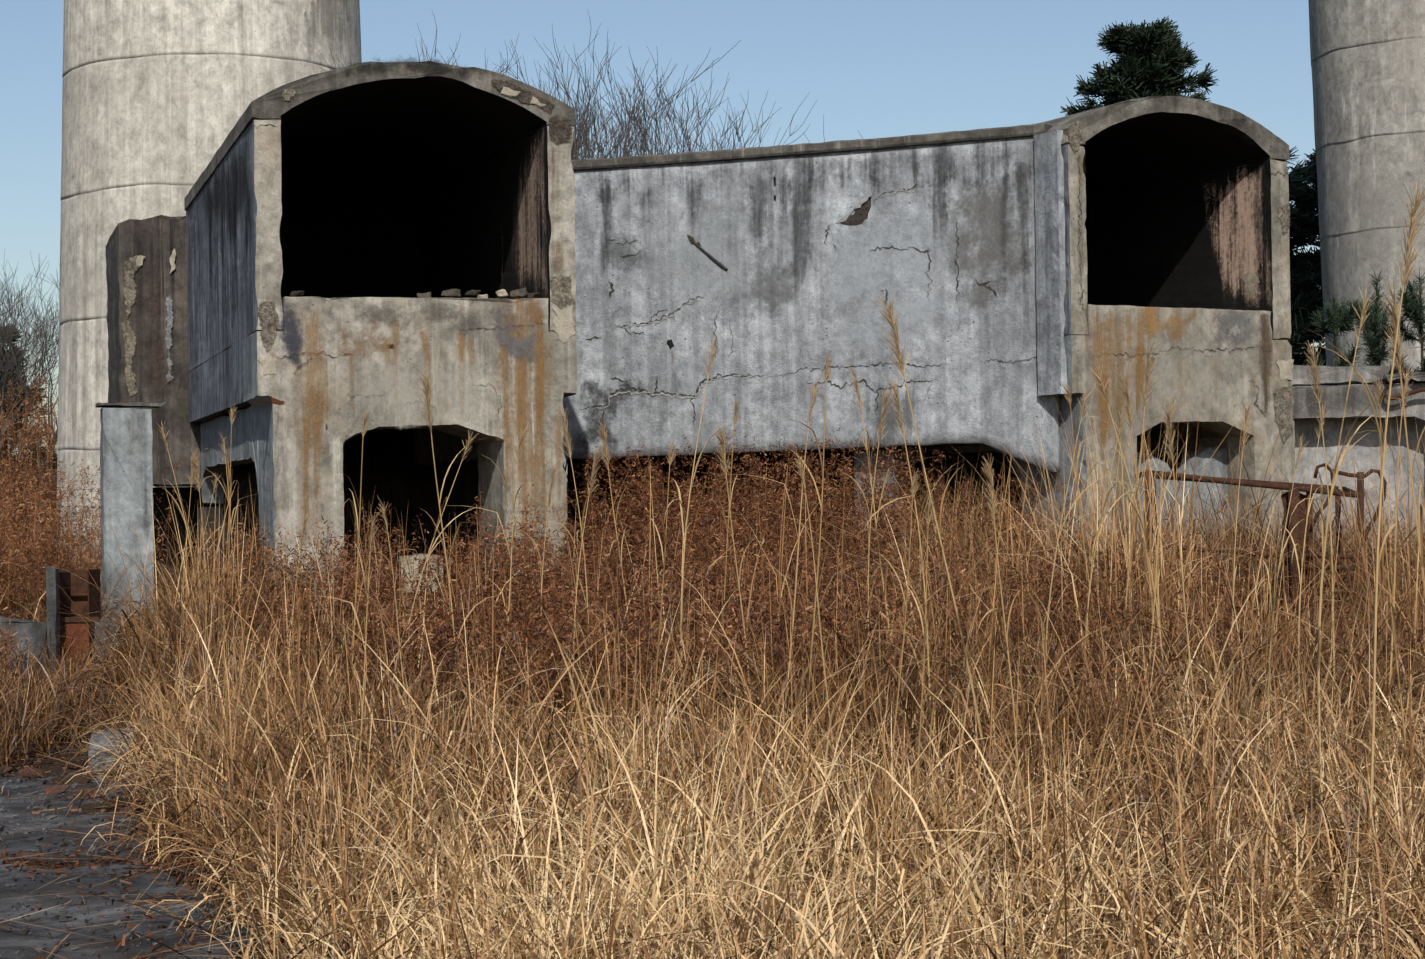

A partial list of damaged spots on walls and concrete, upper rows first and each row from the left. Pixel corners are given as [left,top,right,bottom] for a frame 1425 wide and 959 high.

damp [347,58,466,74]
peeling [121,255,145,396]
corrosion [501,134,546,541]
crack [580,239,942,433]
spalling [836,191,872,225]
crack [824,222,997,299]
corrosion [1094,308,1180,446]